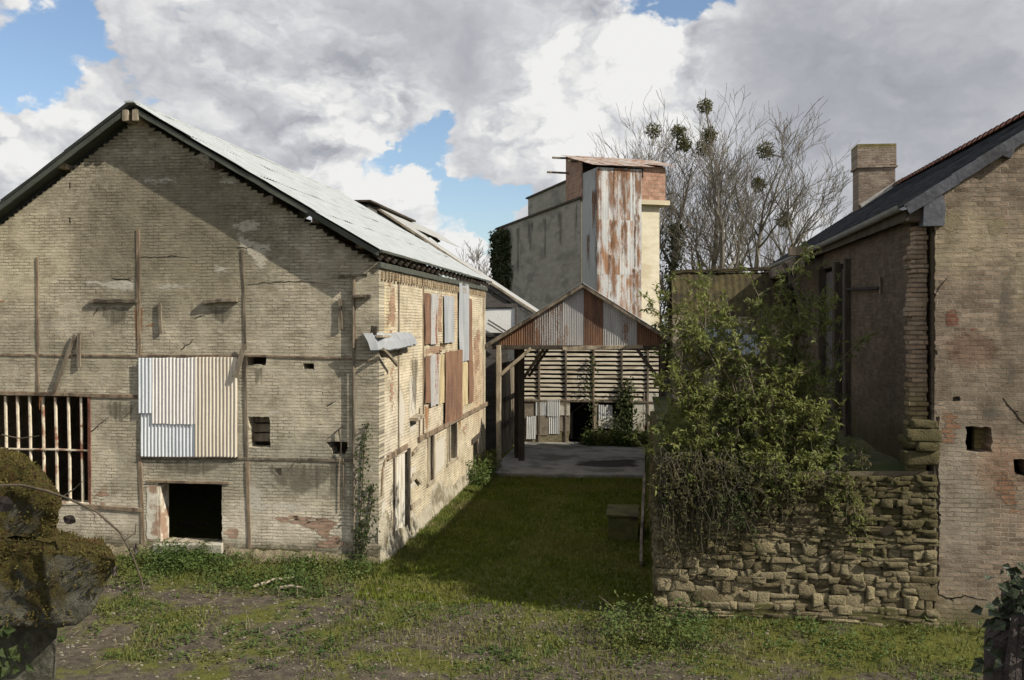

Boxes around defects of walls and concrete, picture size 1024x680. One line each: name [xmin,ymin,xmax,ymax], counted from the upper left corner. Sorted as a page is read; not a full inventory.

corrosion [587,169,642,318]
crack [930,227,985,603]
spalling [276,515,353,548]